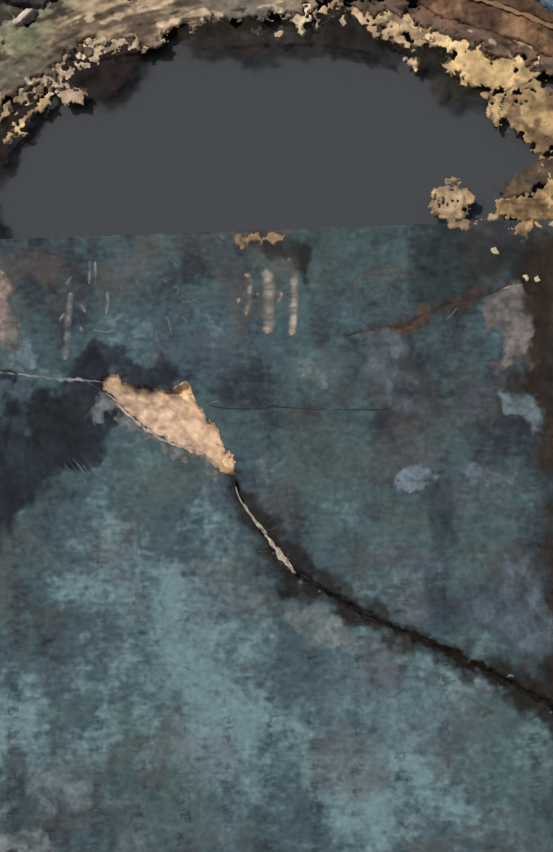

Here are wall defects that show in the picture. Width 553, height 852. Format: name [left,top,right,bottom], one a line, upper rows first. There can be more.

flaking render [0,34,149,144]
flaking render [280,0,553,207]
flaking render [428,176,553,240]
water stain [0,270,37,369]
crack [0,369,108,396]
water stain [0,341,192,530]
spalling [102,374,236,477]
crack [208,401,388,410]
crack [343,284,522,337]
water stain [416,217,553,476]
crack [235,480,553,714]
water stain [472,502,553,698]